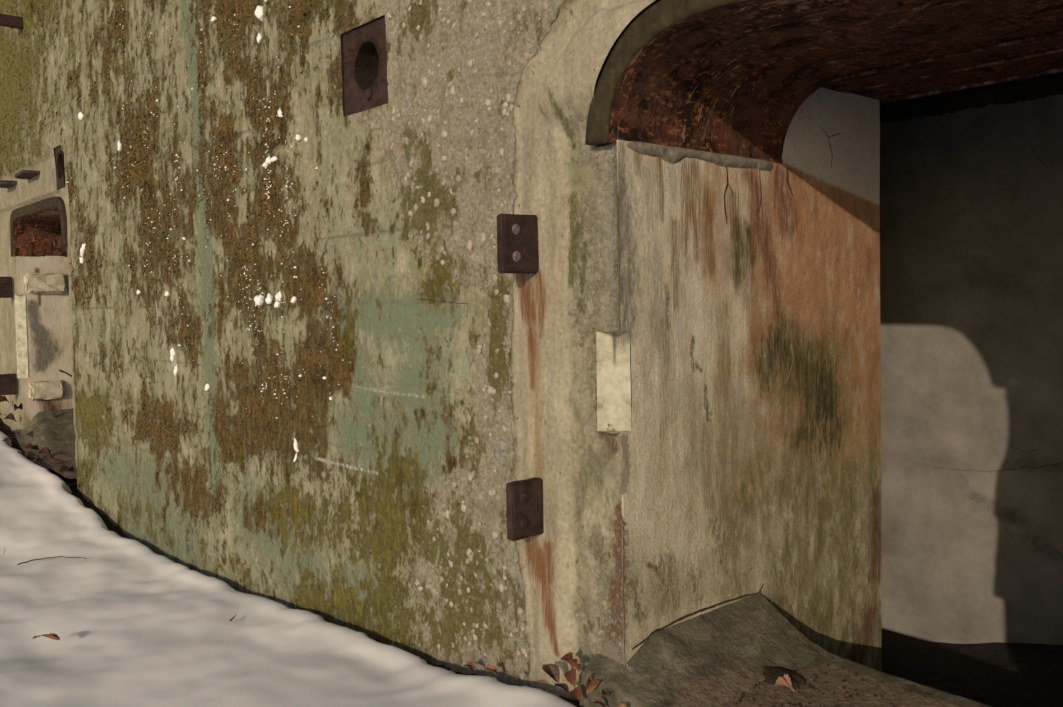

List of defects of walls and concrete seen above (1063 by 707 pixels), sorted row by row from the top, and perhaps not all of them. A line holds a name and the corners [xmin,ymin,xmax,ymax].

damp [181,0,220,495]
corrosion [515,270,545,390]
damp [759,318,841,453]
corrosion [525,536,559,656]